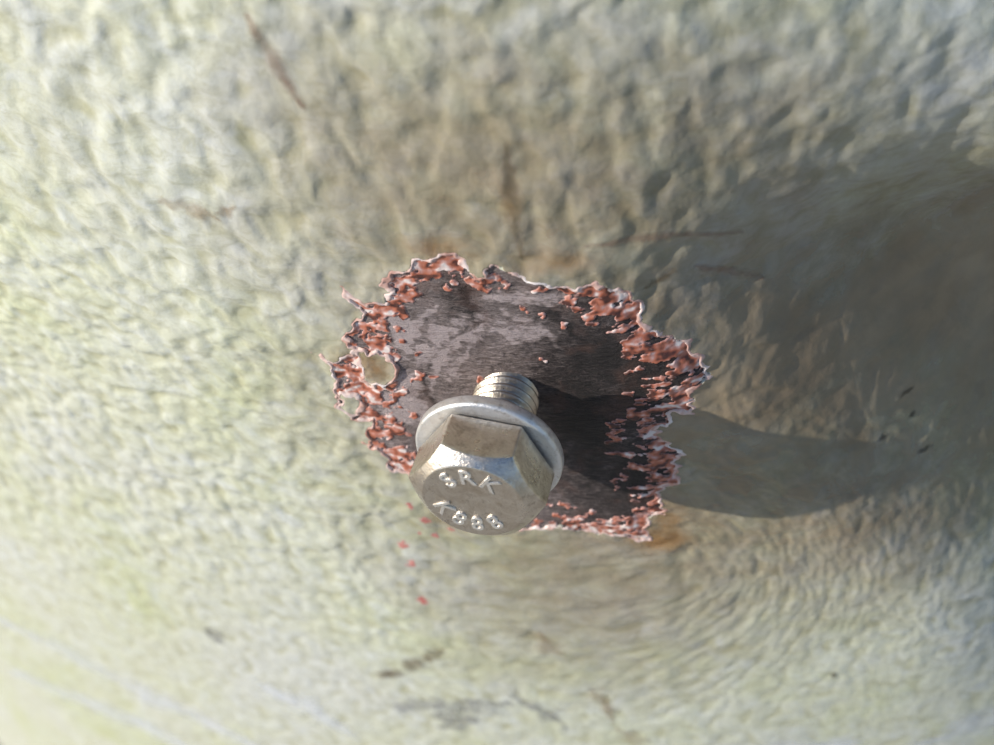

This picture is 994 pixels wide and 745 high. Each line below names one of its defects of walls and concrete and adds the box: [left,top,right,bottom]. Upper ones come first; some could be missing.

peeling [311,252,713,542]
rust [380,123,994,572]